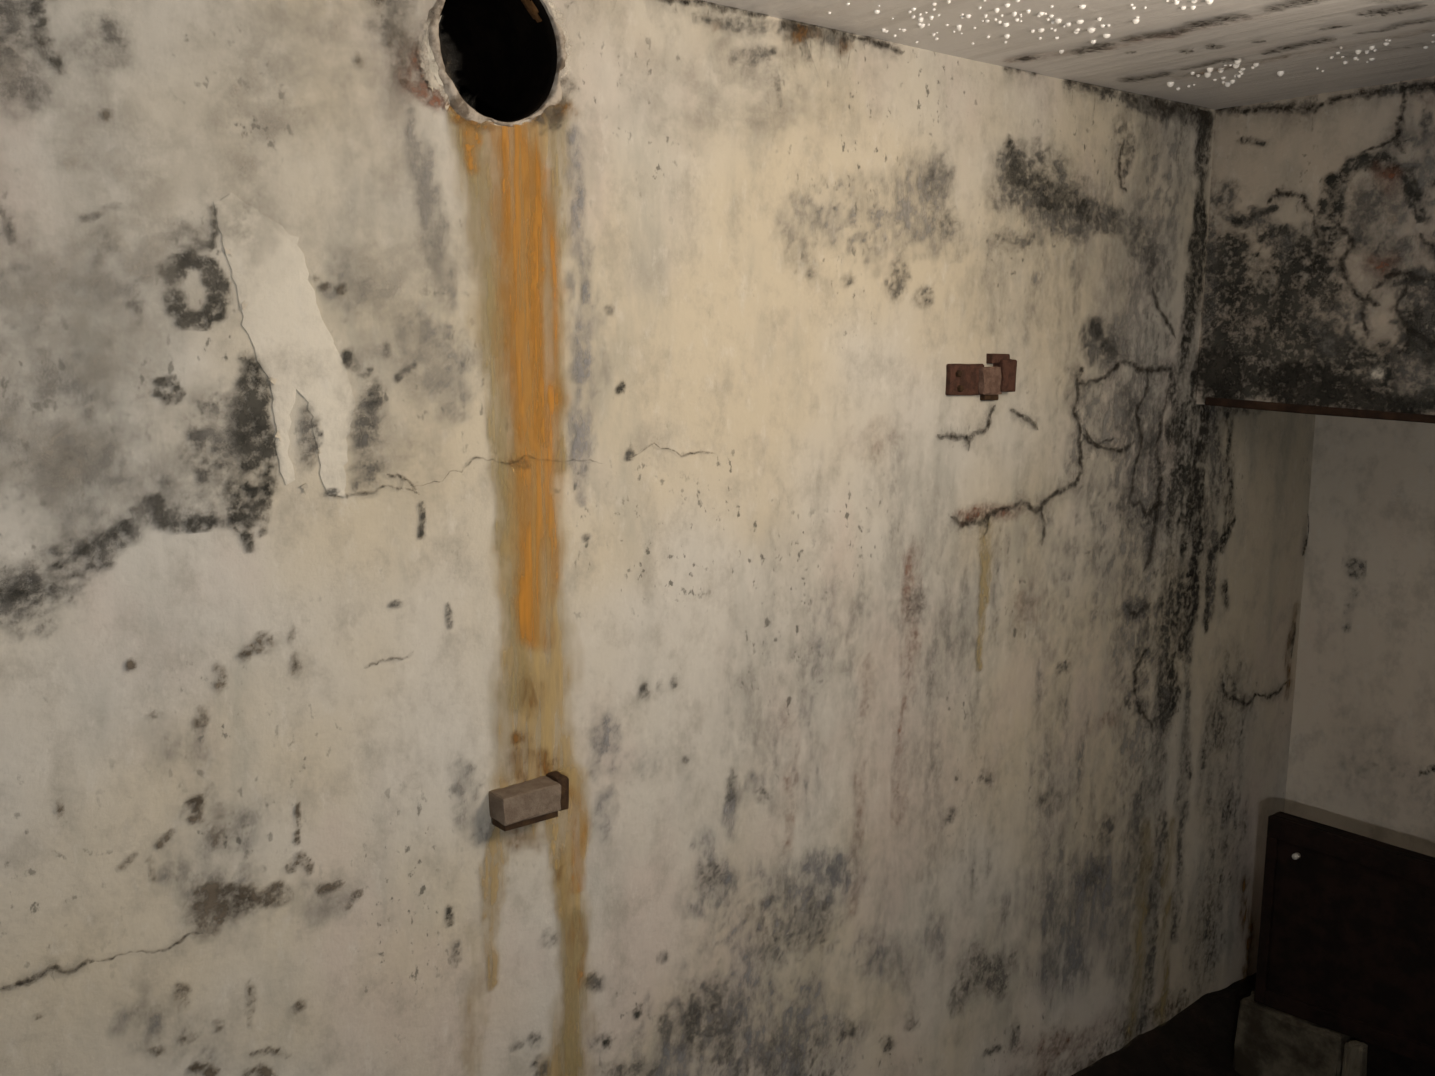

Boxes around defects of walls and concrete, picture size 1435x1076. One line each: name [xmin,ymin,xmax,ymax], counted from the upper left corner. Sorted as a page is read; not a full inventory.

damp [0,0,62,107]
damp [88,207,229,330]
crack [1268,189,1435,353]
damp [0,357,277,628]
damp [355,344,390,490]
corrosion [400,46,588,1076]
crack [941,406,1038,451]
crack [956,288,1174,569]
damp [994,82,1435,1075]
crack [1133,650,1153,729]
crack [3,957,115,989]
damp [616,854,855,1076]